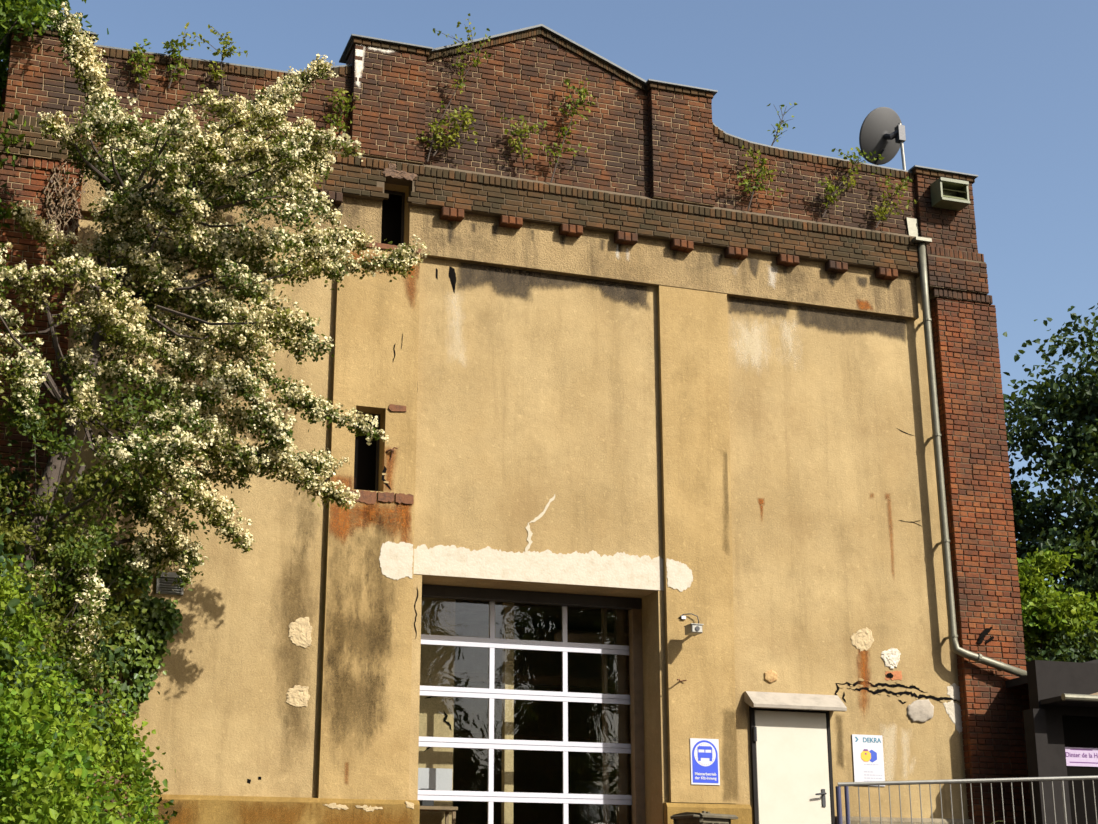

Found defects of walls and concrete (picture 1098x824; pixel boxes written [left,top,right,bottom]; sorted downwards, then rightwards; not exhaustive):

corrosion [329,504,409,543]
crack [525,495,555,556]
peeling [288,617,312,648]
spalling [850,627,902,681]
peeling [286,685,310,708]
corrosion [859,650,869,708]
crack [835,678,960,704]